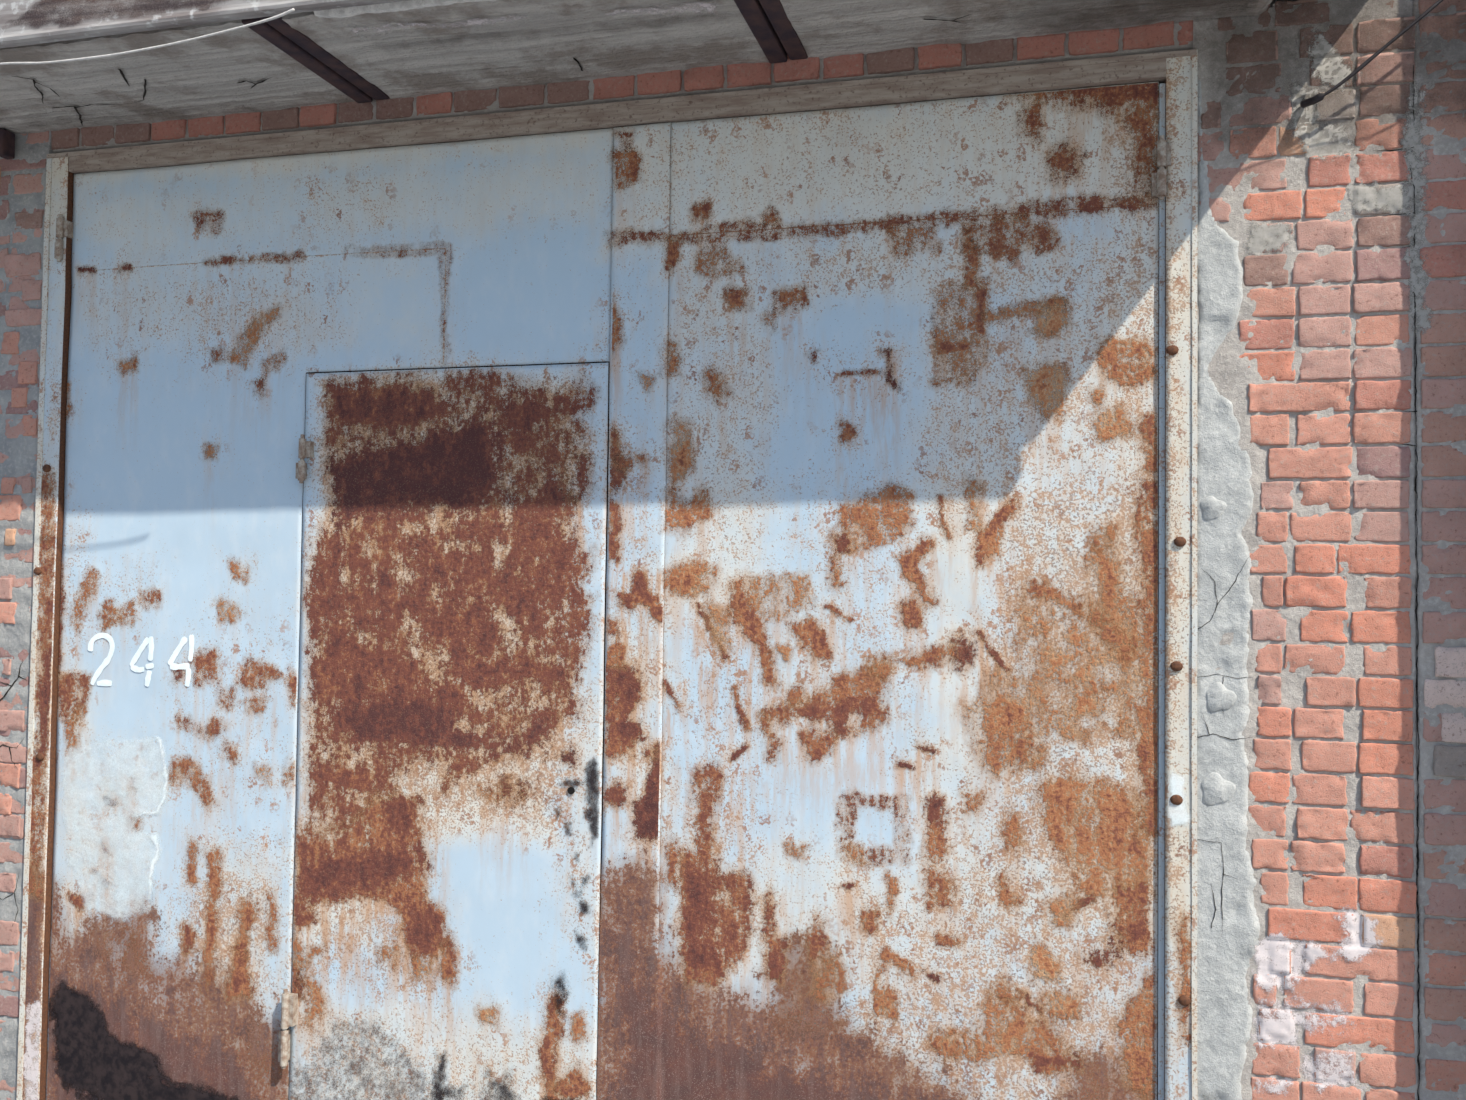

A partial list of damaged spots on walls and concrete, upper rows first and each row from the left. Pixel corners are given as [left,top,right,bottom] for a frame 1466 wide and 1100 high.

crack [12,69,147,125]
rust [193,210,223,234]
rust [204,250,306,266]
rust [361,241,452,288]
rust [609,83,1158,387]
rust [211,307,286,394]
crack [1198,560,1247,629]
rust [22,335,1158,1100]
crack [1197,674,1250,740]
rust [1175,913,1192,1045]
damp [1251,907,1383,1094]